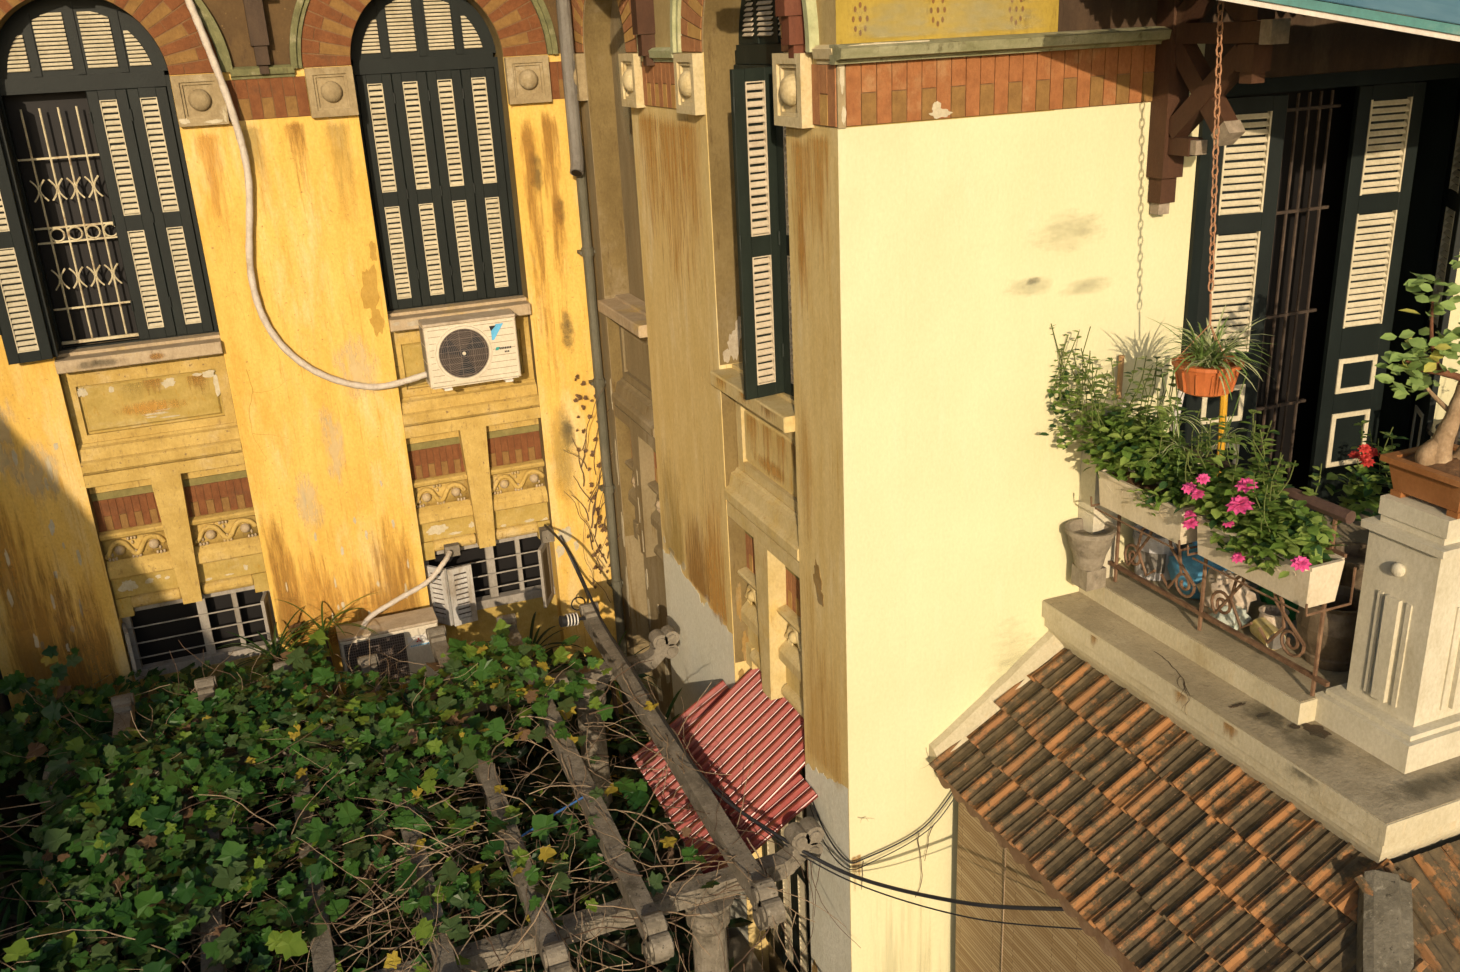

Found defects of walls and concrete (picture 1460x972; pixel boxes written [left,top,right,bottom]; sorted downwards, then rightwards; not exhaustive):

water stain [523,117,562,281]
peeling [723,316,742,363]